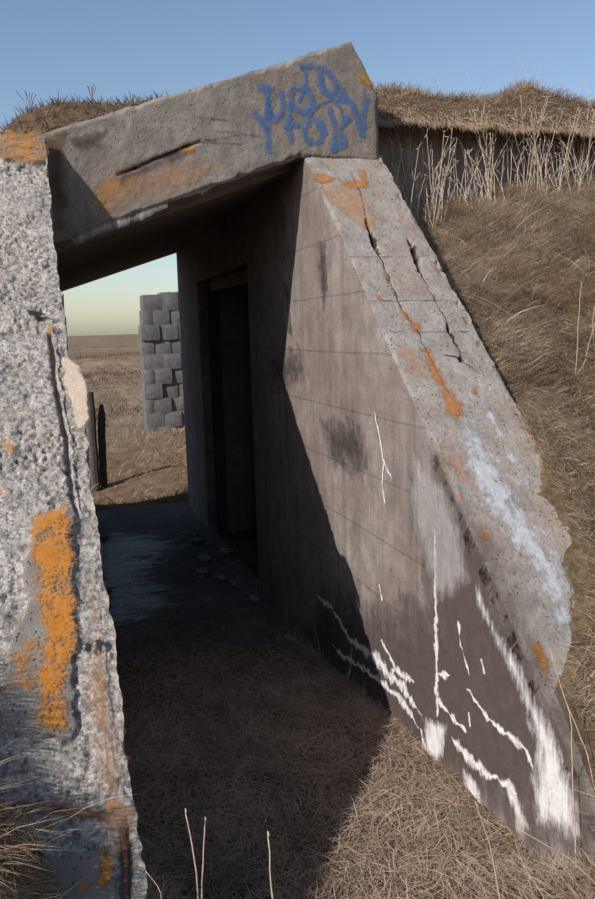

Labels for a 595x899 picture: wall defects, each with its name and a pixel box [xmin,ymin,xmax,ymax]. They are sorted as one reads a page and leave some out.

crack [120,116,263,178]
crack [353,176,477,392]
water stain [375,415,392,503]
water stain [305,465,584,845]